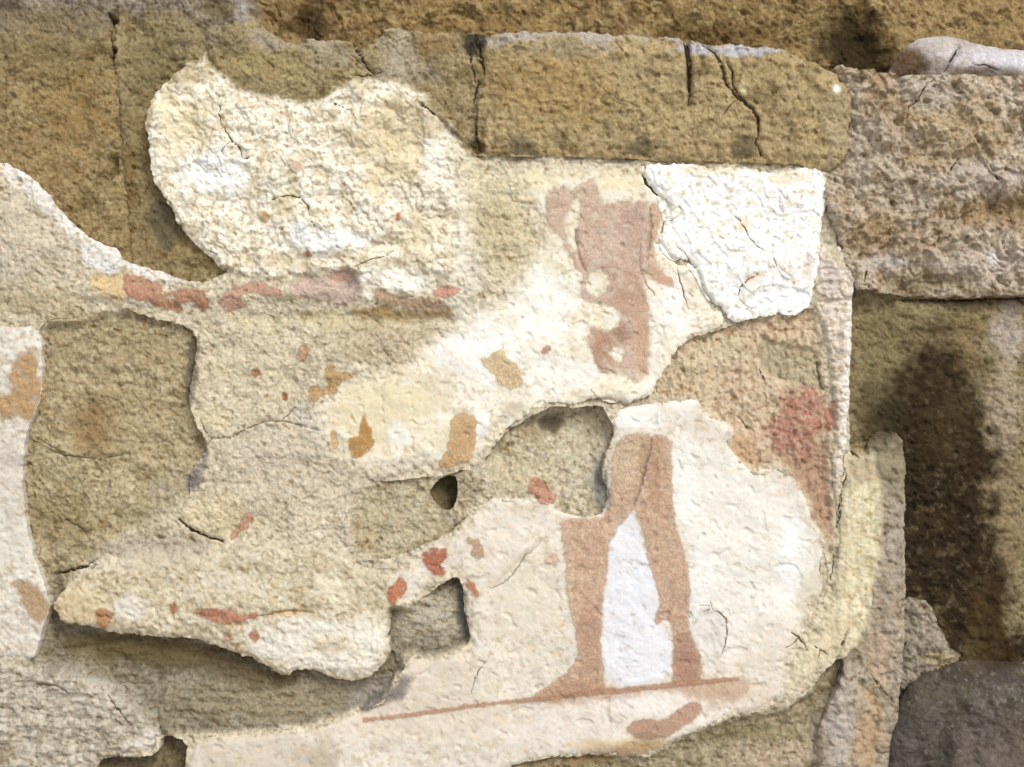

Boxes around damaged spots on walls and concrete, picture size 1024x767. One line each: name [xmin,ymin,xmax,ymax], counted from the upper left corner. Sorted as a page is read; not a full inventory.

crack [469,41,485,143]
crack [683,43,762,156]
crack [200,407,319,442]
peeling [343,163,839,574]
crack [179,519,223,542]
spalling [25,307,471,767]
leakage [863,347,1024,665]